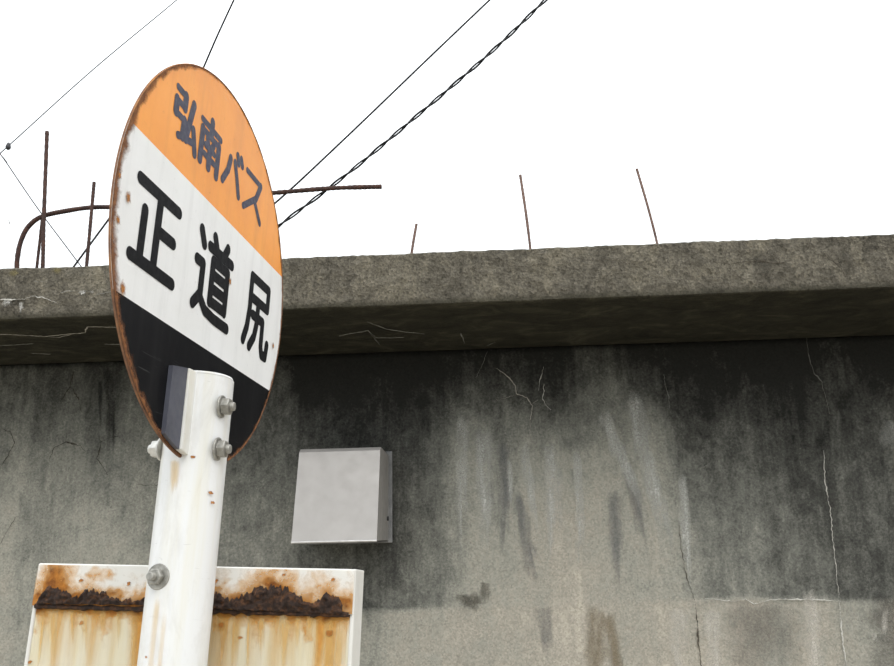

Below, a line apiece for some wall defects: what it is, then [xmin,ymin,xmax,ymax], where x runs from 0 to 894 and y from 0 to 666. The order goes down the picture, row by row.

crack [0,281,111,301]
crack [0,328,88,354]
crack [477,343,551,428]
crack [679,456,847,666]